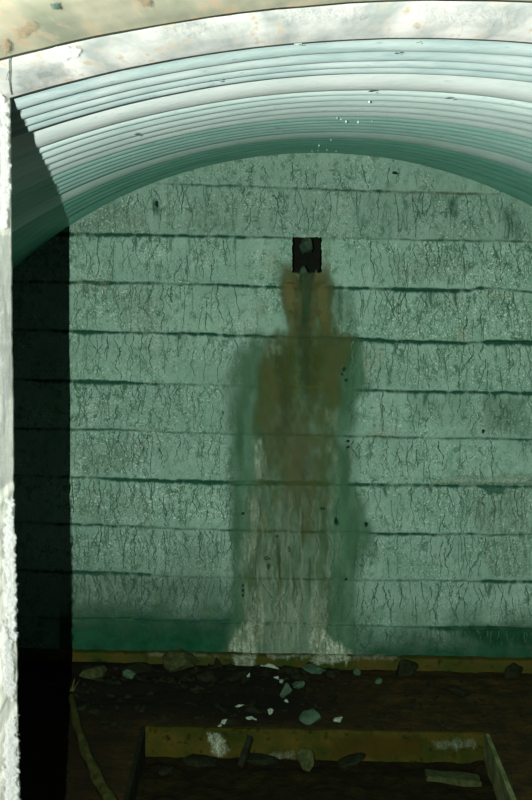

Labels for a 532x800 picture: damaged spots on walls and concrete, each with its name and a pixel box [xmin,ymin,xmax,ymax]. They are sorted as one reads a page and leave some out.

crack [12,162,532,649]
corrosion [251,272,352,616]
leakage [310,338,371,662]